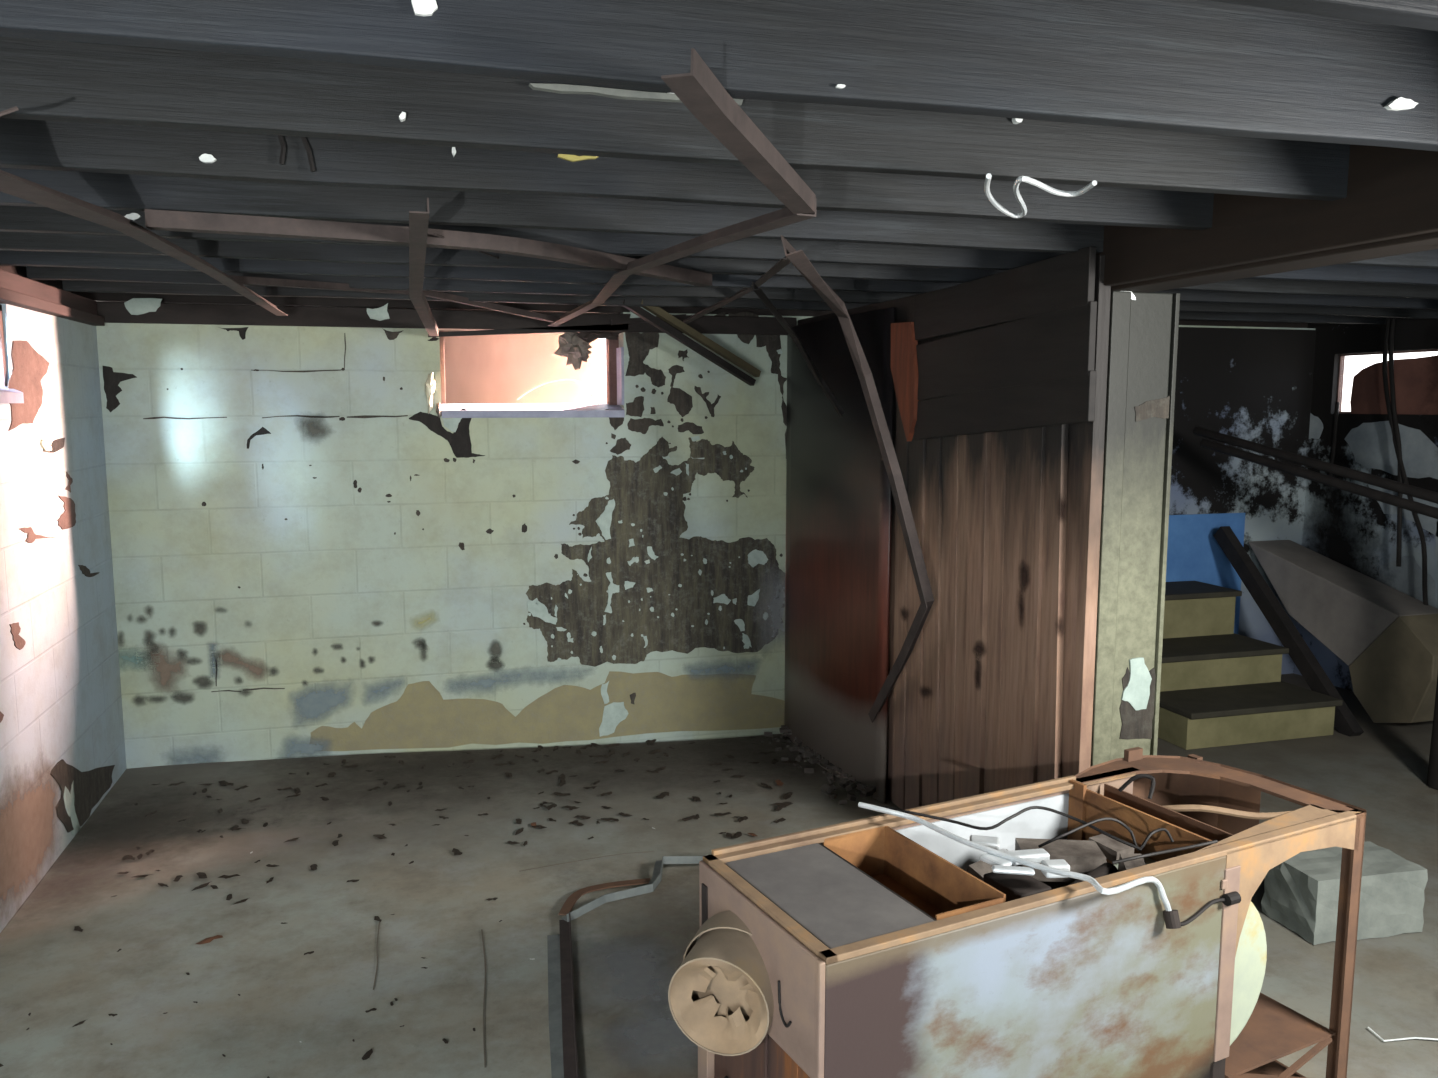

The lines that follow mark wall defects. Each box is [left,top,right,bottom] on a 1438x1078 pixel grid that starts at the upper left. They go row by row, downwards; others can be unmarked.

peeling [124,298,162,315]
peeling [221,327,248,340]
peeling [103,366,137,413]
spalling [40,438,65,453]
peeling [19,472,76,543]
peeling [310,303,787,751]
peeling [9,622,26,650]
leakage [415,616,432,659]
leakage [450,642,561,689]
leakage [285,645,374,759]
peeling [1119,657,1156,740]
spalling [51,759,115,836]